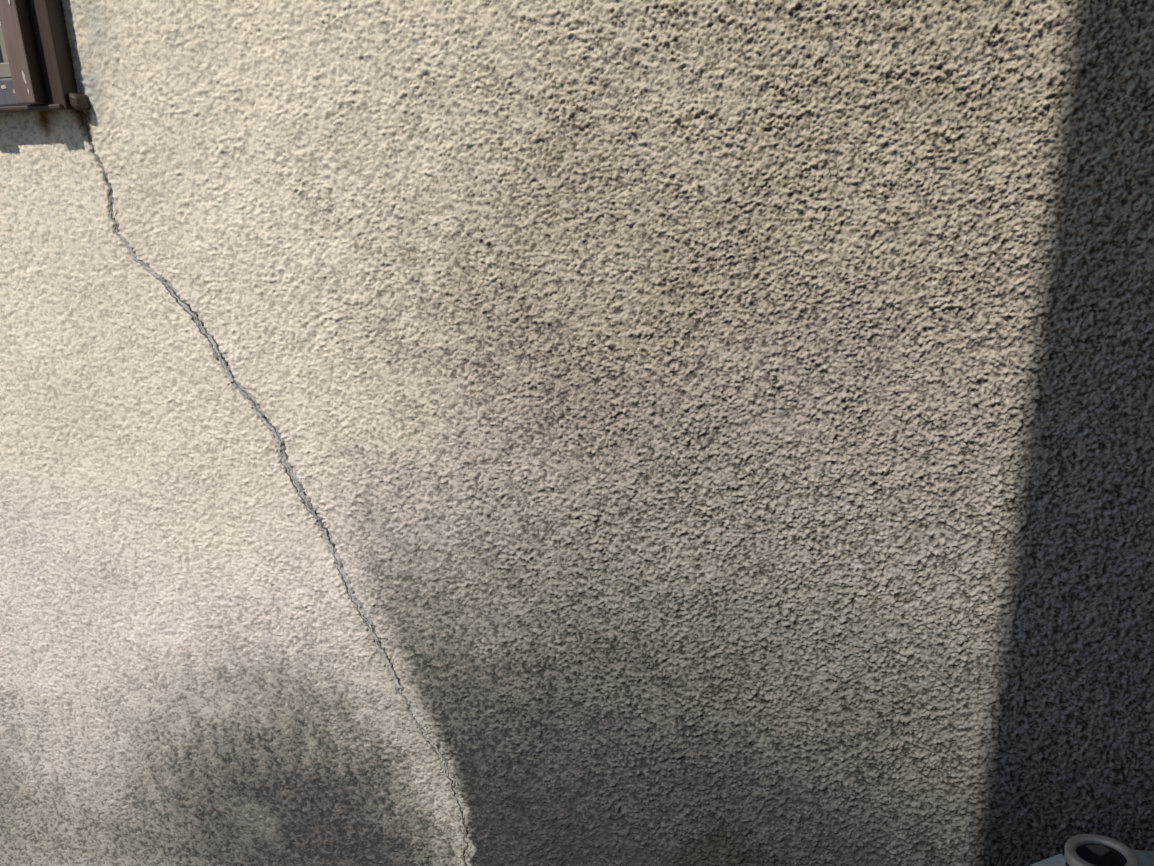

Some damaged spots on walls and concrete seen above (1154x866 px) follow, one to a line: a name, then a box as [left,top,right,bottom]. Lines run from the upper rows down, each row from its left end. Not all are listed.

crack [80,110,468,866]